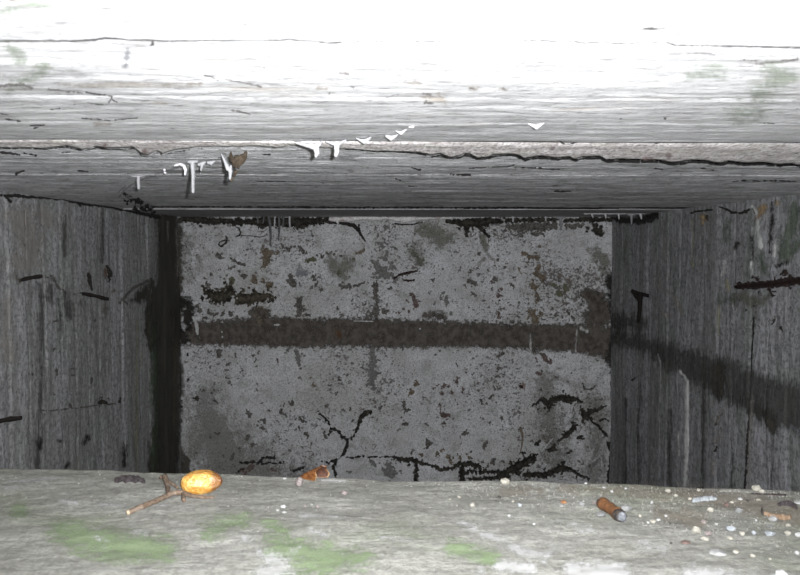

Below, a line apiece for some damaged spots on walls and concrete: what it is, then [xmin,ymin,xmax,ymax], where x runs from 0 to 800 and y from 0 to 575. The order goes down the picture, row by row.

crack [294,120,800,187]
crack [0,146,755,242]
spalling [177,217,612,327]
damp [750,202,787,275]
damp [122,214,800,488]
crack [517,427,525,455]
crack [587,416,610,484]